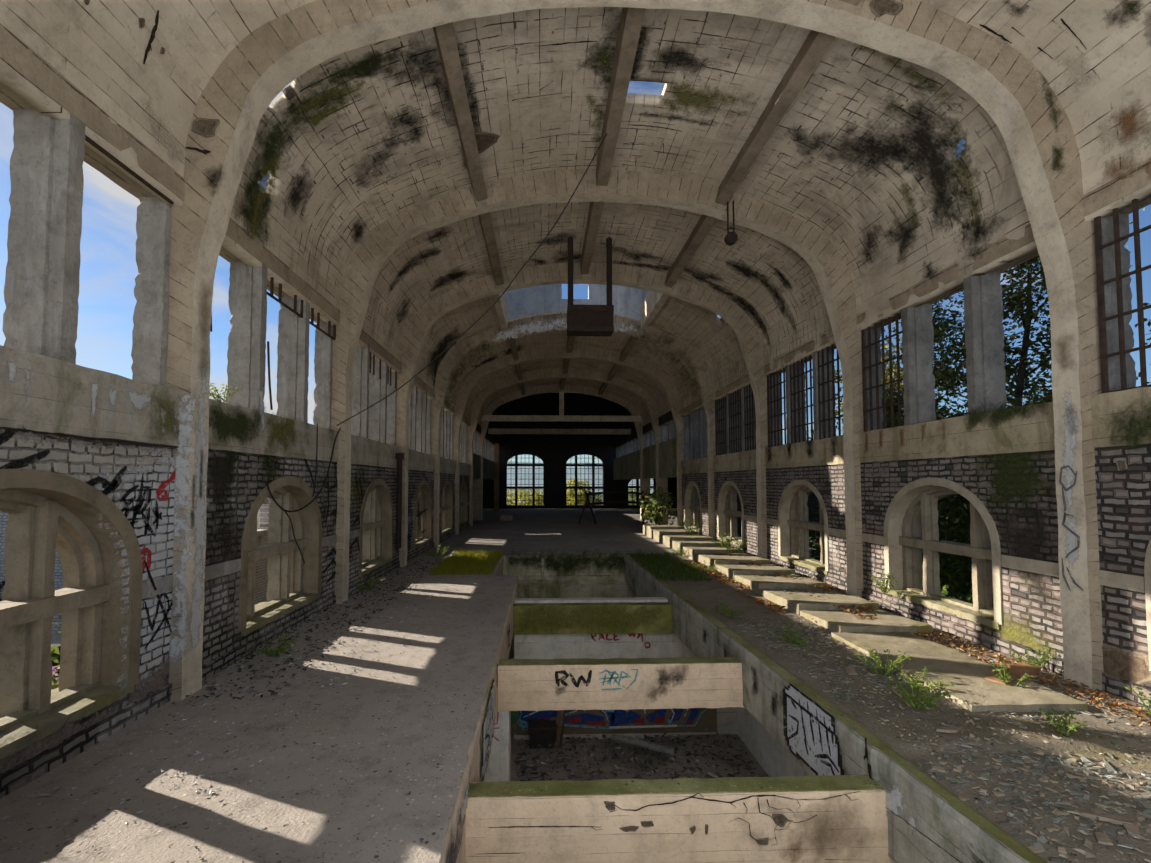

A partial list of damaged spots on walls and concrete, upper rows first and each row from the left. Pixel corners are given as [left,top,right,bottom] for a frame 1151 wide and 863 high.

crack [143,10,159,65]
leakage [381,41,452,120]
leakage [457,44,479,132]
leakage [584,23,620,89]
leakage [630,27,706,80]
leakage [288,175,312,210]
leakage [358,110,422,185]
leakage [790,85,995,260]
leakage [353,221,365,242]
crack [458,738,962,863]